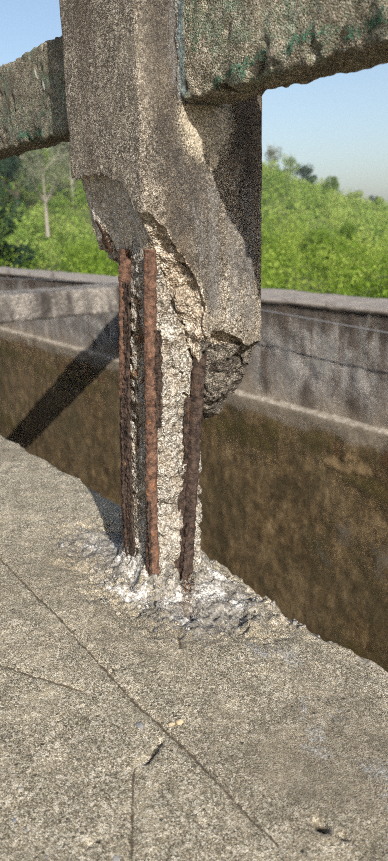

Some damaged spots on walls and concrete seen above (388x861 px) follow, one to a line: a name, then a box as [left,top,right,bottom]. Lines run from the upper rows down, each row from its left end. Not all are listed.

corrosion [134,287,144,350]
corrosion [131,369,145,448]
spalling [53,174,338,647]
crack [0,559,279,847]
crack [128,769,136,861]